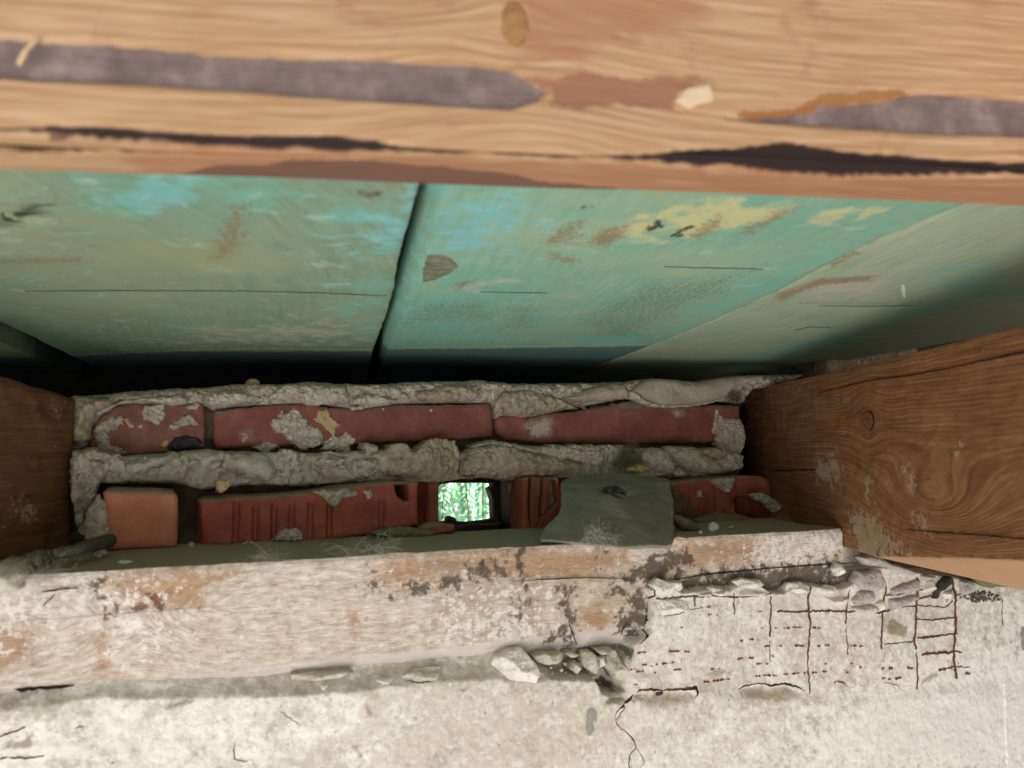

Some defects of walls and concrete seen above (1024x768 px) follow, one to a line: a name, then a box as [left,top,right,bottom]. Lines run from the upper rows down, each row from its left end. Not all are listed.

crack [25,289,382,297]
flaking render [618,644,634,660]
corrosion [737,628,863,686]
corrosion [630,650,729,692]
flaking render [638,686,699,706]
flaking render [739,682,804,702]
crack [615,694,645,768]